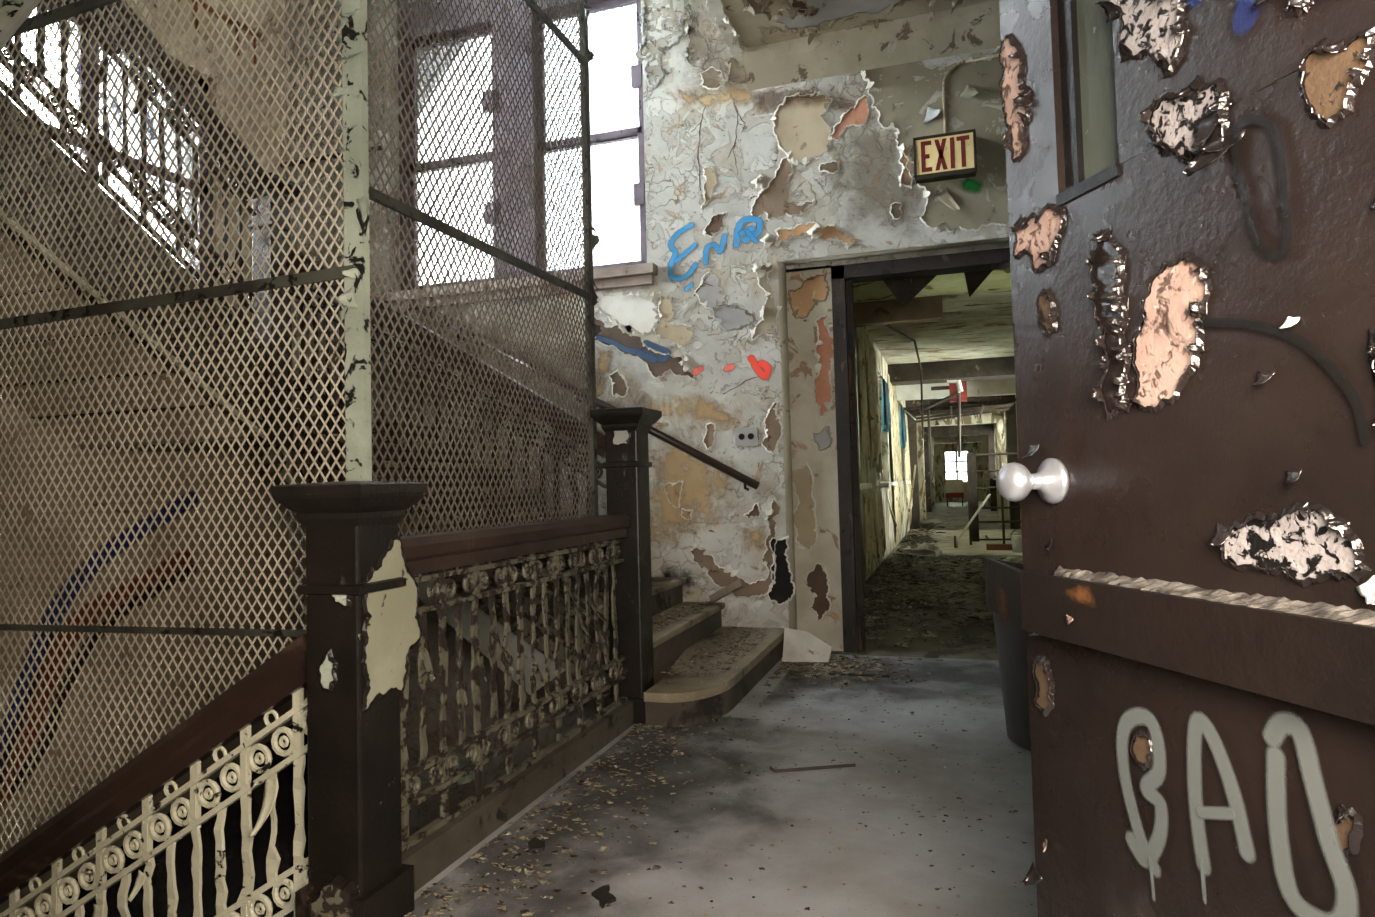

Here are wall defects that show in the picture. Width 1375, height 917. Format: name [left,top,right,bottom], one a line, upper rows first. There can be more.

peeling [635,0,963,90]
peeling [1095,0,1247,177]
peeling [1297,26,1375,129]
peeling [694,33,1067,455]
peeling [591,279,695,398]
peeling [1084,228,1213,421]
peeling [1367,329,1375,385]
peeling [611,429,631,447]
spalling [688,498,832,622]
peeling [1209,502,1375,605]
peeling [317,649,338,692]
peeling [330,534,422,712]